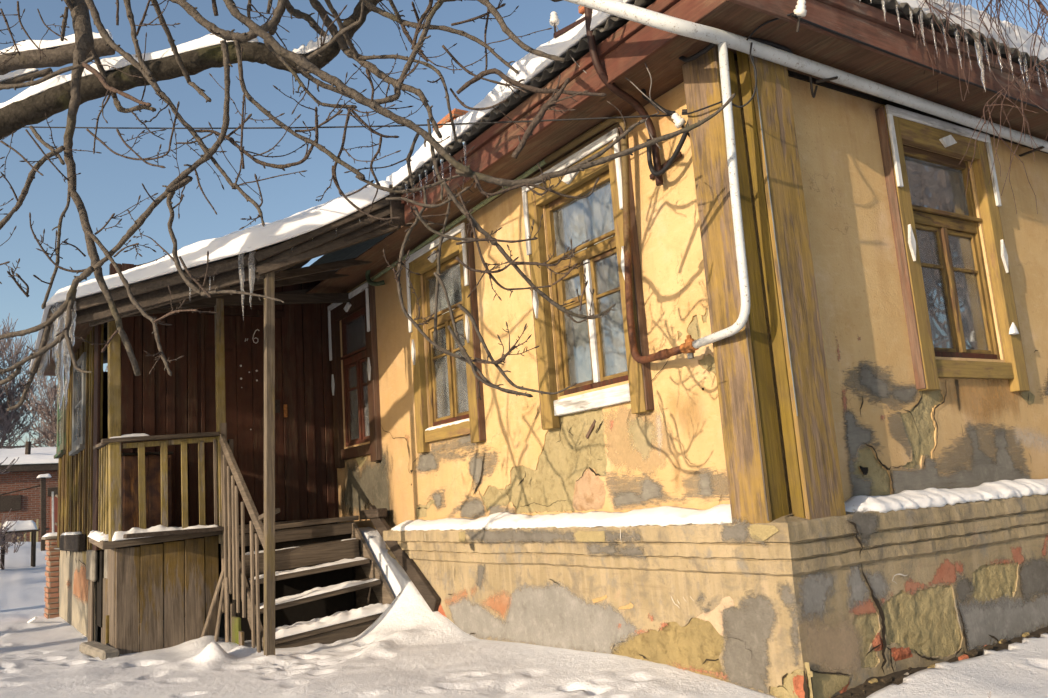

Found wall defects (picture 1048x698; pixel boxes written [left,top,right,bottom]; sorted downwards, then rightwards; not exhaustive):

flaking render [678,308,708,340]
flaking render [699,354,716,374]
flaking render [1019,391,1035,405]
flaking render [480,405,674,514]
flaking render [853,446,891,496]
flaking render [416,499,436,519]
crack [849,521,999,675]
flaking render [971,562,1018,602]
flaking render [852,584,962,668]
flaking render [612,618,730,682]
flaking render [770,662,850,698]
crack [803,668,850,698]